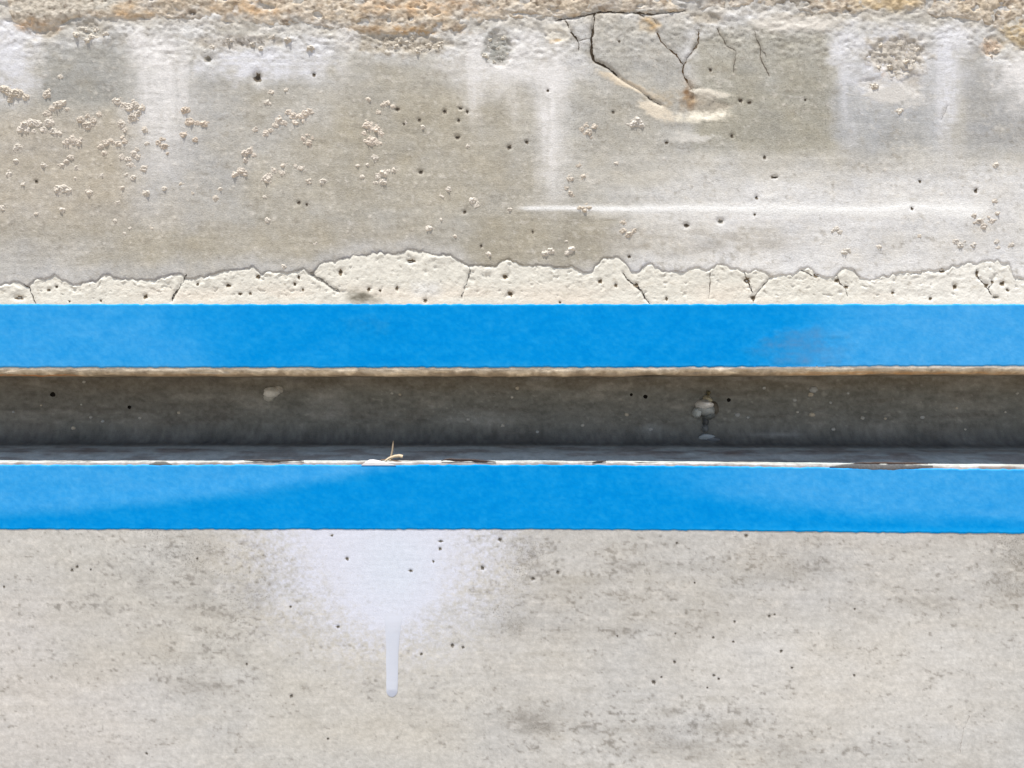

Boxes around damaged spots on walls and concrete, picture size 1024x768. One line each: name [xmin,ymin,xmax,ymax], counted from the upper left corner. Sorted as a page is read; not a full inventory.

spalling [540,21,575,43]
crack [557,10,769,105]
spalling [741,8,852,36]
damp [112,22,366,217]
corrosion [625,76,708,112]
spalling [0,250,1024,305]